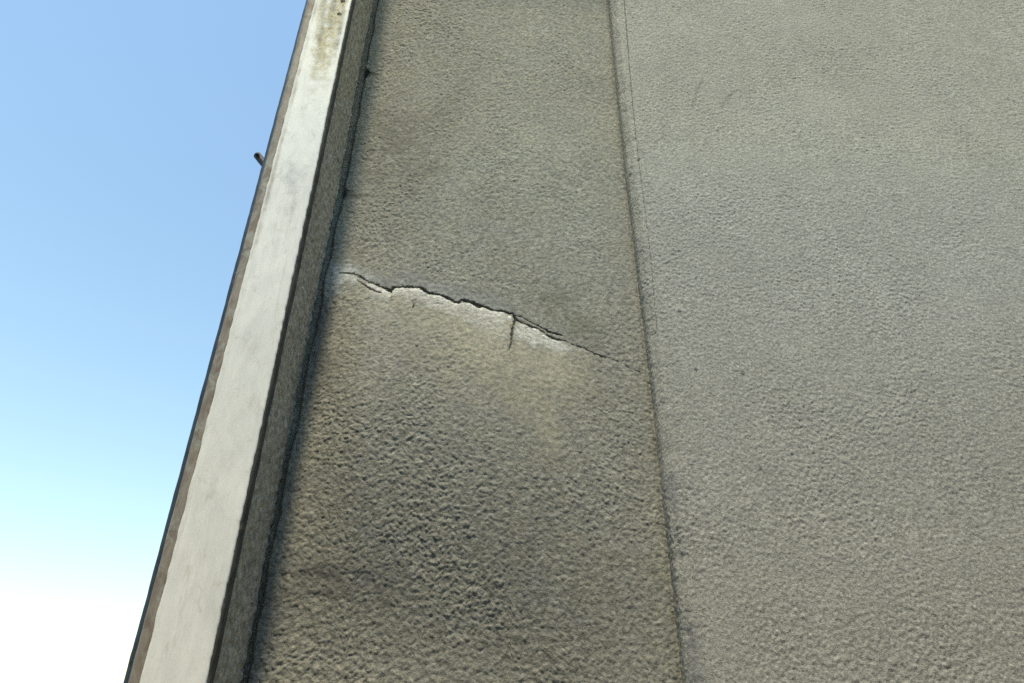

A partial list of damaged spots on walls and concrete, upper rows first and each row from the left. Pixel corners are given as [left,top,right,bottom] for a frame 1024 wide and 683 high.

crack [346,273,642,374]